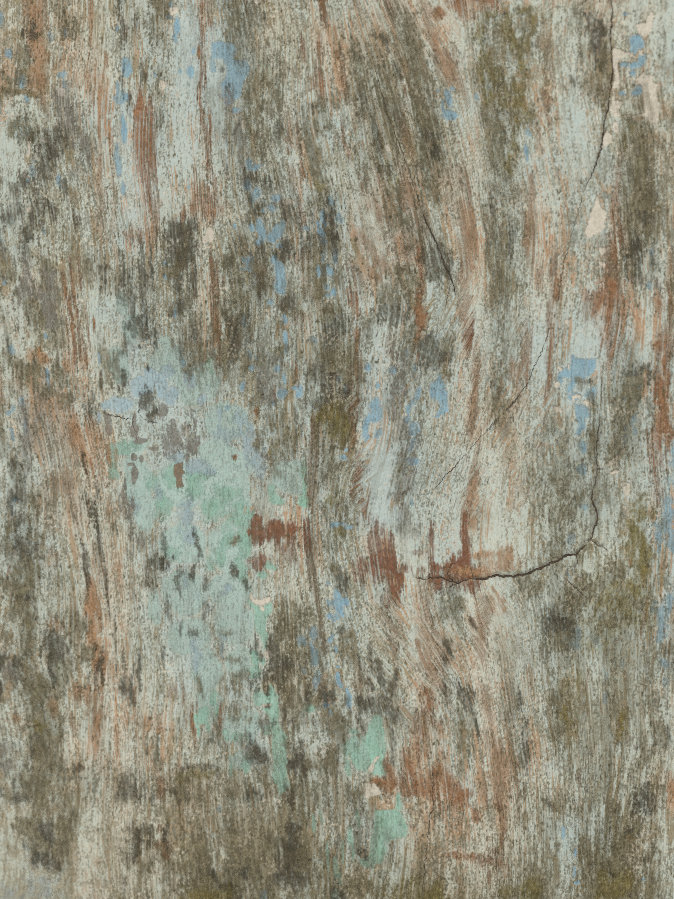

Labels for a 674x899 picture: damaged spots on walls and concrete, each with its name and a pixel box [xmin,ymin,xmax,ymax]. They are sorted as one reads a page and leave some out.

crack [557,0,614,302]
spalling [603,9,660,148]
crack [431,324,551,493]
crack [414,378,606,597]